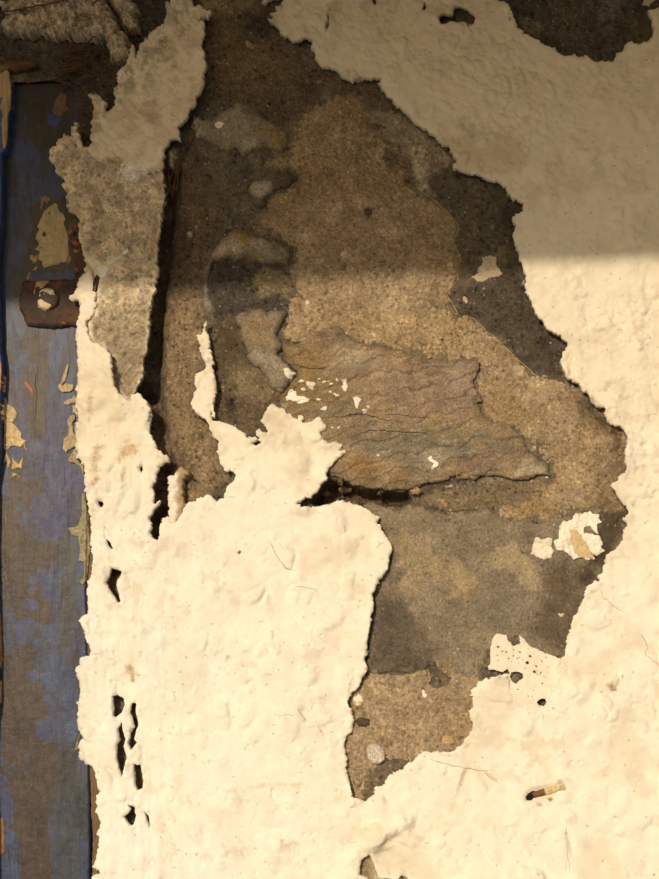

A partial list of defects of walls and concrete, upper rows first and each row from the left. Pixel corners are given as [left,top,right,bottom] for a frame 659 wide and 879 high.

spalling [499,0,659,62]
peeling [0,0,212,400]
peeling [0,362,28,477]
peeling [58,364,84,476]
spalling [137,0,628,801]
peeling [68,493,91,585]
spalling [107,568,121,602]
spalling [113,695,143,790]
spalling [125,806,150,825]
spalling [360,855,379,879]